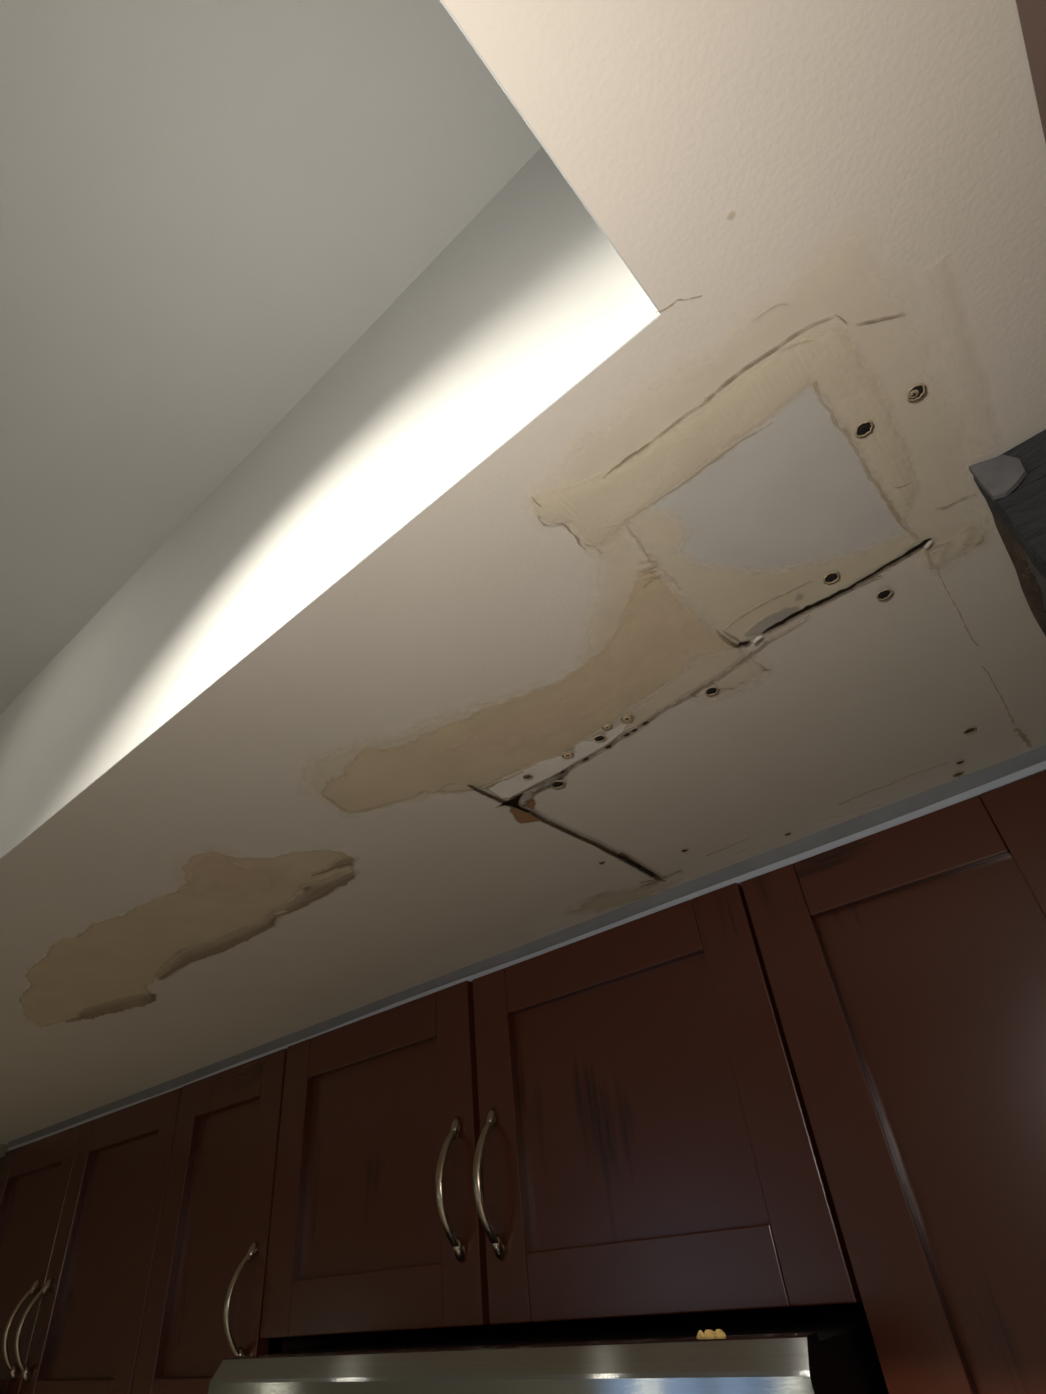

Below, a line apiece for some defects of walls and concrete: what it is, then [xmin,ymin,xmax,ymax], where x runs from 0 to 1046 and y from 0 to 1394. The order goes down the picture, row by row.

peeling [484,650,743,799]
crack [467,494,976,887]
peeling [158,859,354,980]
peeling [66,995,155,1023]